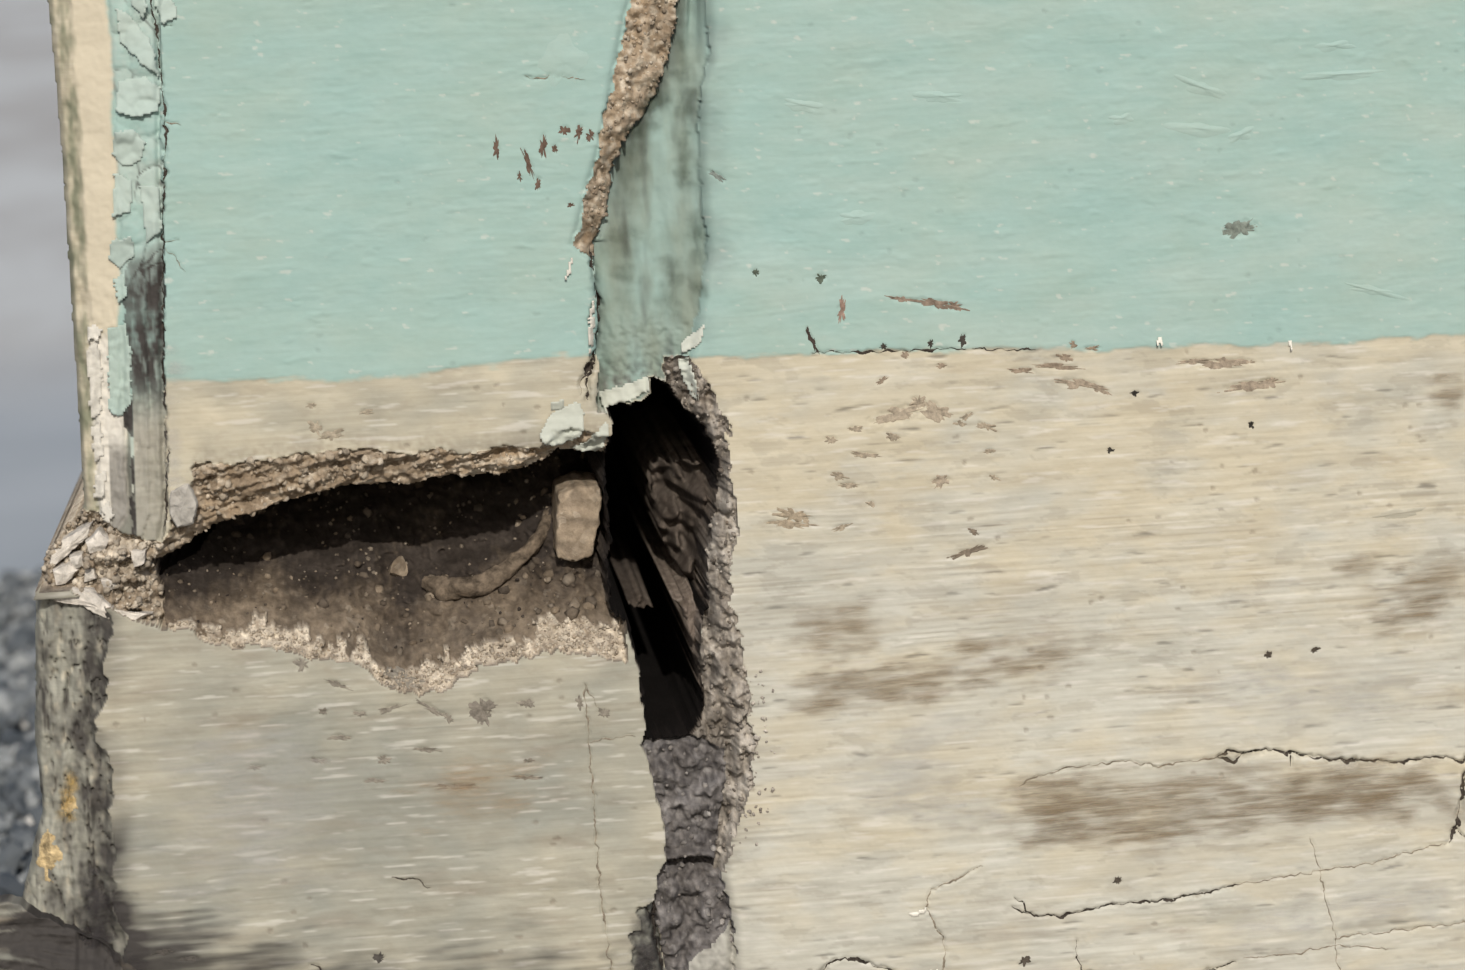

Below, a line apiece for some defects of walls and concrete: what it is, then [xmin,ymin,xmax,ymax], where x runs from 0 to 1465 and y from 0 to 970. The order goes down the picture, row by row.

peeling [108,0,177,303]
flaking render [517,0,679,280]
peeling [678,325,705,401]
spalling [35,323,650,726]
crack [583,685,663,970]
spalling [629,902,665,970]
crack [823,957,892,970]
crack [926,865,981,970]
water stain [1026,773,1423,841]
crack [1013,748,1465,970]